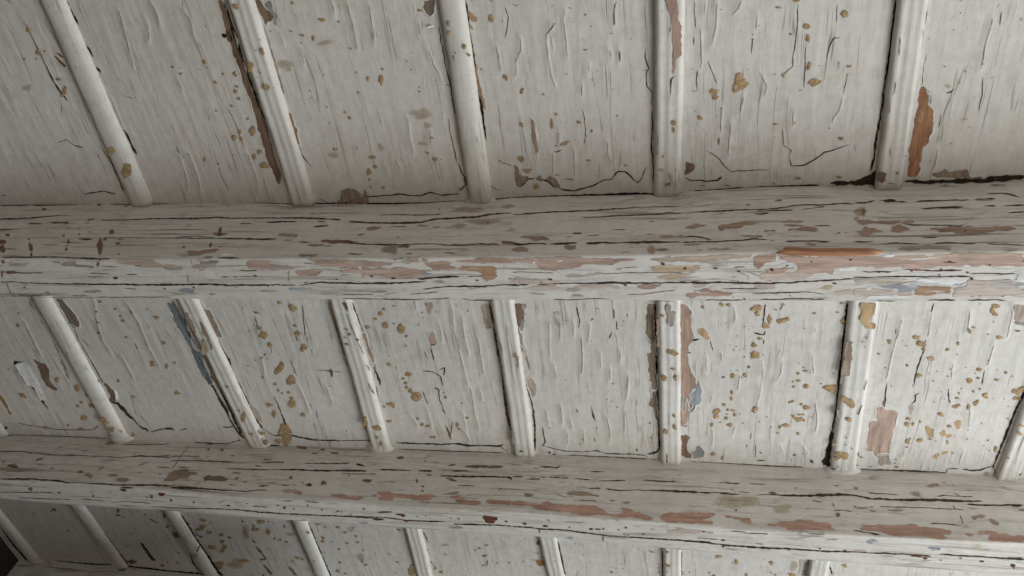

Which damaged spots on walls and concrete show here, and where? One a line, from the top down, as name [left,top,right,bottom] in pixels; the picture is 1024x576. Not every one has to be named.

peeling [666,0,682,74]
peeling [216,0,283,188]
crack [493,109,658,191]
crack [782,78,850,166]
peeling [904,83,985,180]
peeling [246,232,636,297]
peeling [166,288,223,390]
crack [0,183,1024,575]
peeling [638,204,1024,467]
peeling [446,464,752,536]
peeling [853,506,952,552]
peeling [966,515,1024,542]